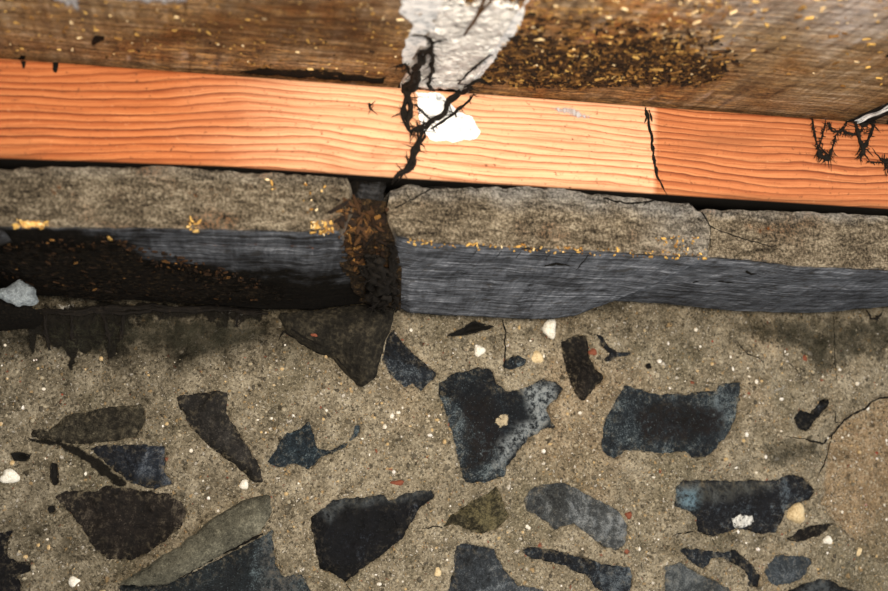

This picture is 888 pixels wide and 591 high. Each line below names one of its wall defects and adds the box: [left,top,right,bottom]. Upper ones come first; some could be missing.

crack [603,107,778,252]
crack [788,397,888,479]